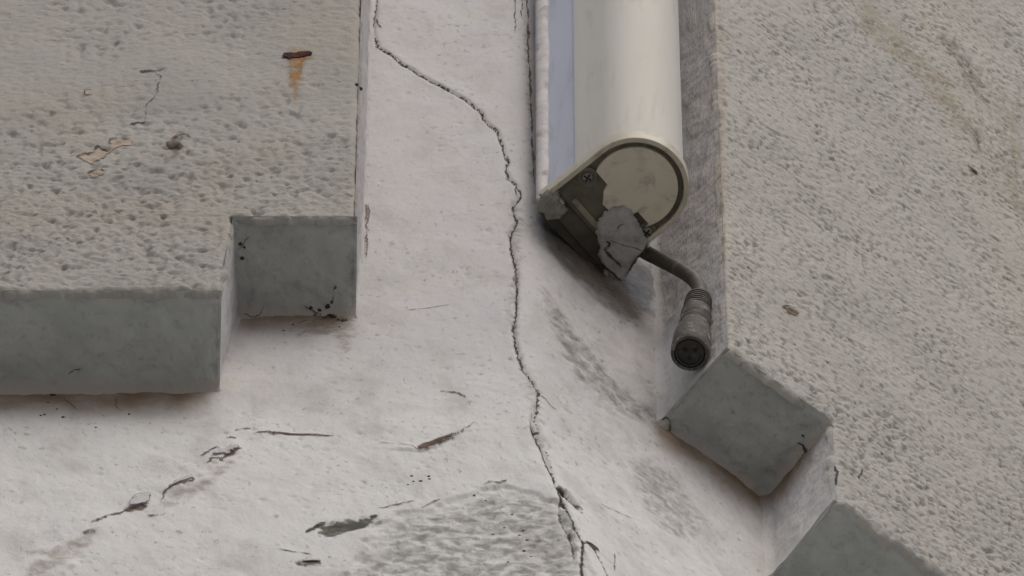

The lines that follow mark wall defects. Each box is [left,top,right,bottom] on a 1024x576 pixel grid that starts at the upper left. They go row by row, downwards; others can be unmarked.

rust [282,49,312,85]
crack [131,67,165,124]
peeling [76,137,133,178]
crack [373,2,616,576]
crack [255,429,331,437]
spalling [306,515,378,536]